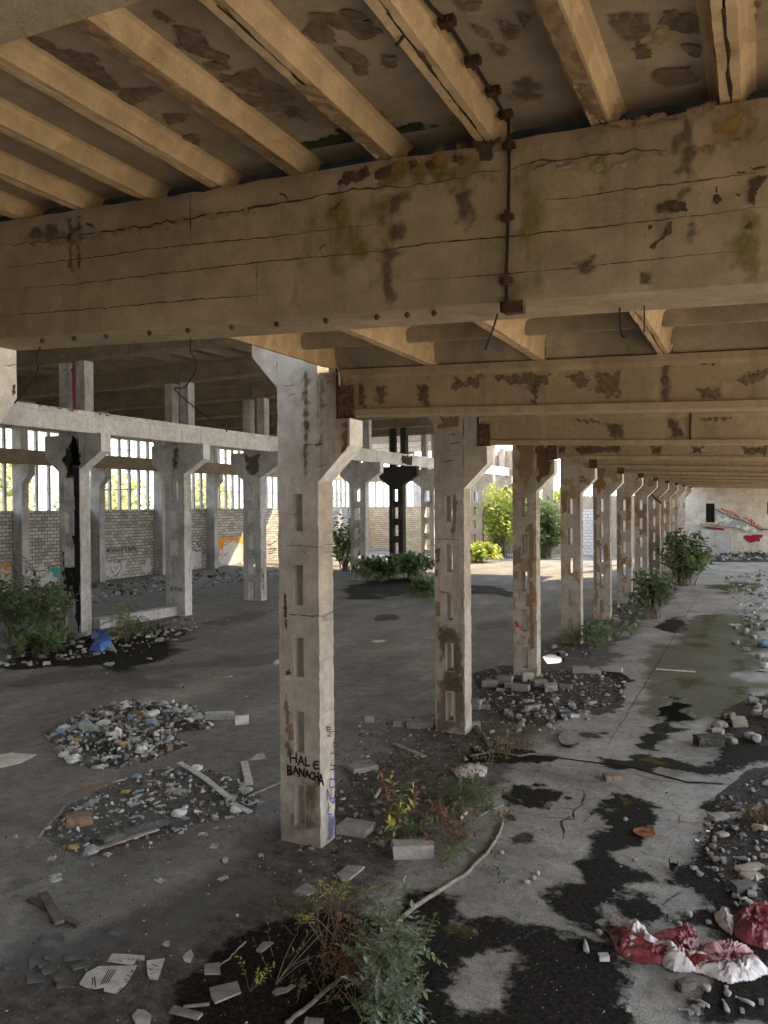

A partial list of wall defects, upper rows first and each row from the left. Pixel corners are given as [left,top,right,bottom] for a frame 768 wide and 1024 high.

spalling [30,19,301,175]
peeling [153,10,398,187]
spalling [453,0,673,127]
crack [721,8,733,95]
crack [1,148,768,316]
leakage [380,195,407,301]
peeling [451,371,622,399]
leakage [0,436,195,674]
peeling [513,523,534,650]
peeling [594,467,647,614]
leakage [599,696,768,775]
crack [551,790,598,839]